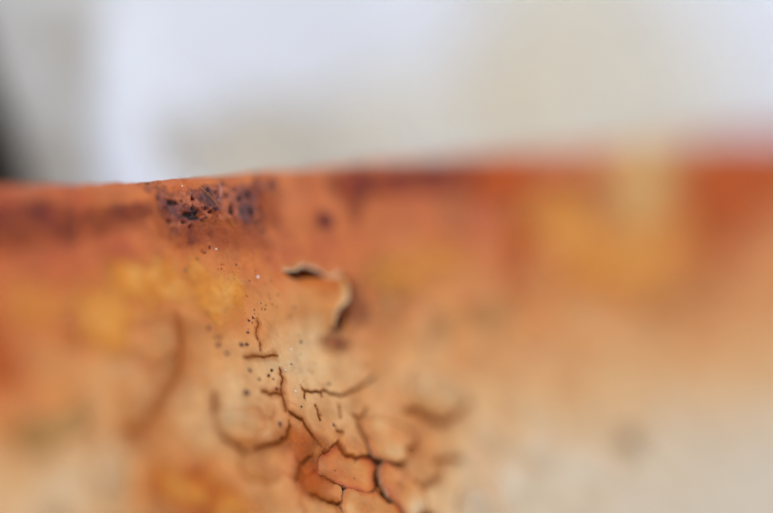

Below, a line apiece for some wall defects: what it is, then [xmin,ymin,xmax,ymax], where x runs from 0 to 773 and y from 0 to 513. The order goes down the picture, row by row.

rust [0,201,77,242]
rust [334,159,540,218]
rust [679,135,773,260]
rust [76,175,279,356]
peeling [281,258,349,329]
rust [335,278,397,324]
rust [325,335,351,353]
crack [212,319,376,506]
crack [404,407,464,426]